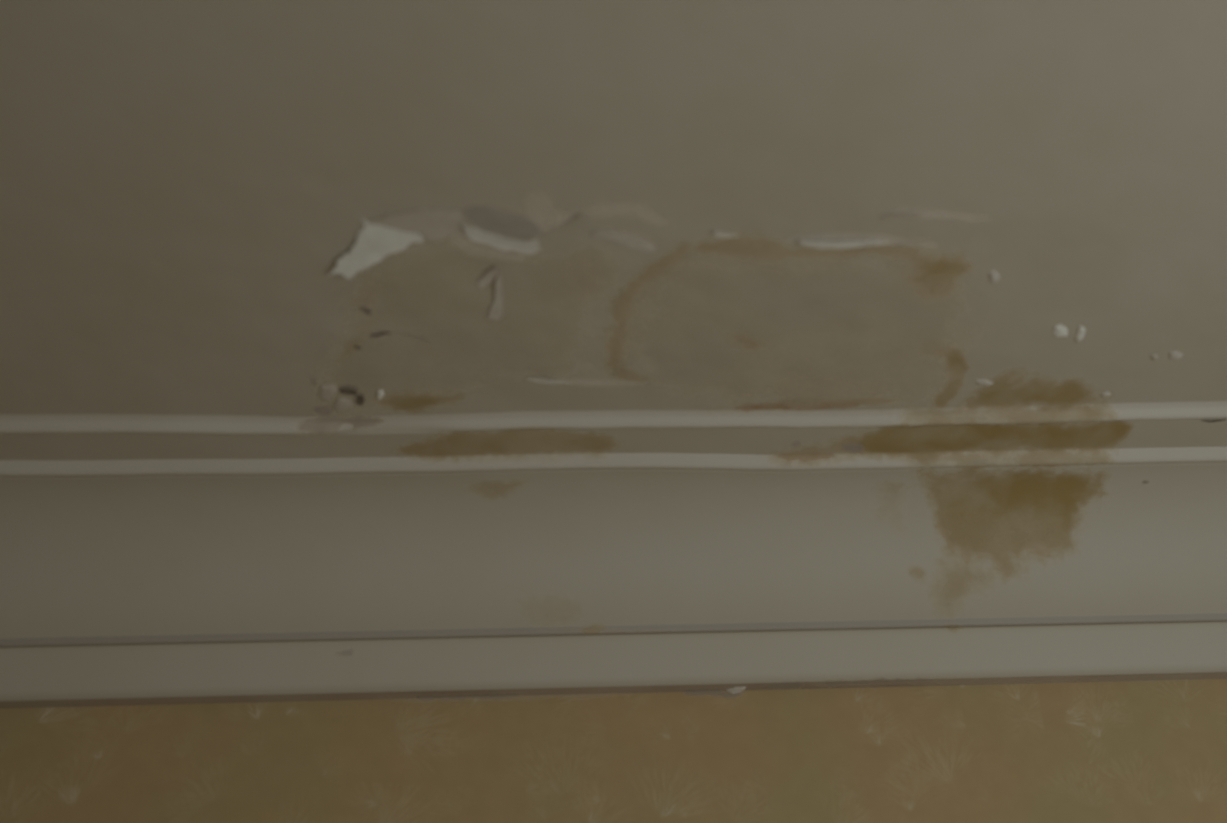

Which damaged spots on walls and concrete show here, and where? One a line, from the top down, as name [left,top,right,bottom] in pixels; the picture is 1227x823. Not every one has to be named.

peeling [328,206,541,321]
leakage [401,430,613,458]
leakage [835,346,1132,596]